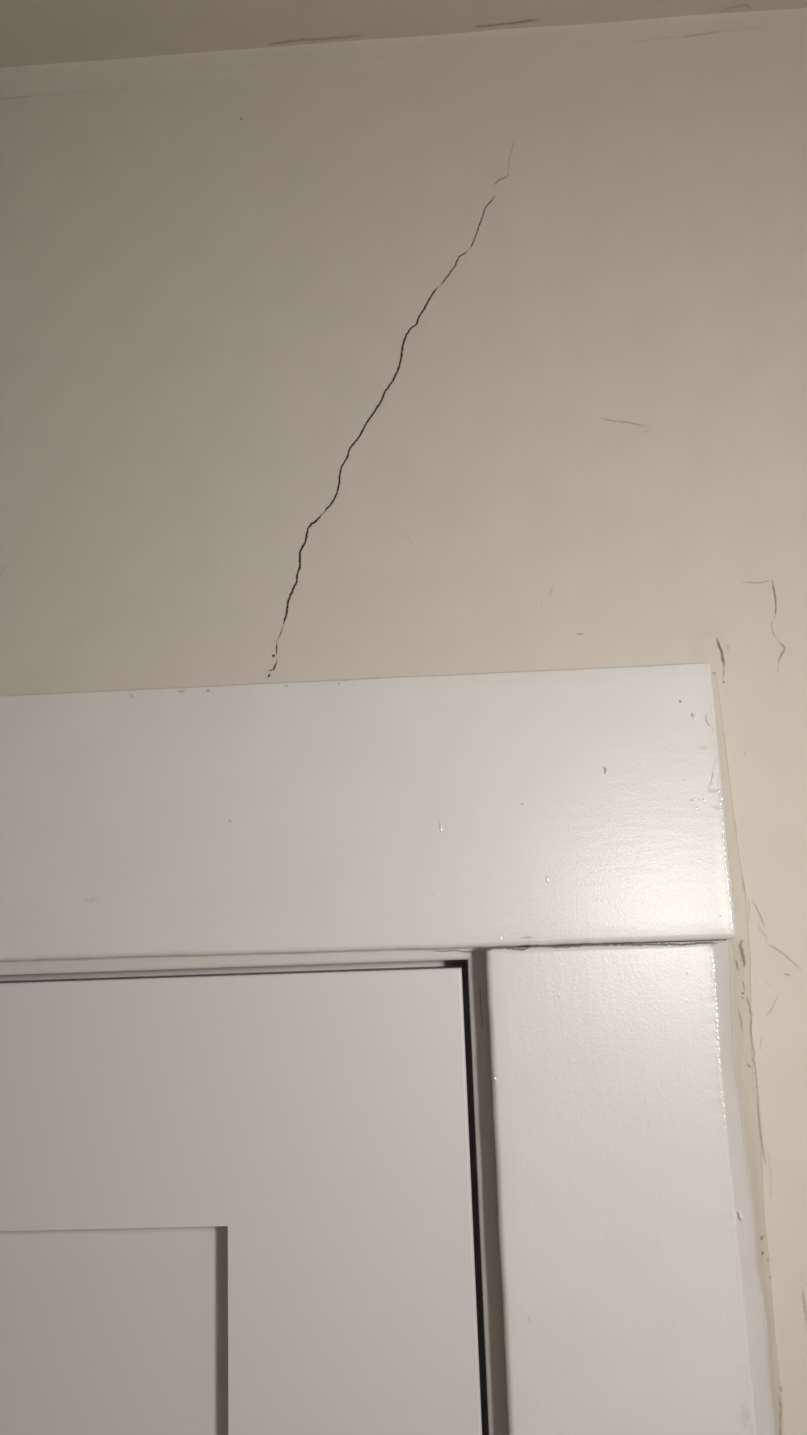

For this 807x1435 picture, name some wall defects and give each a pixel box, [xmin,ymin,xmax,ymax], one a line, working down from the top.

crack [268,177,505,677]